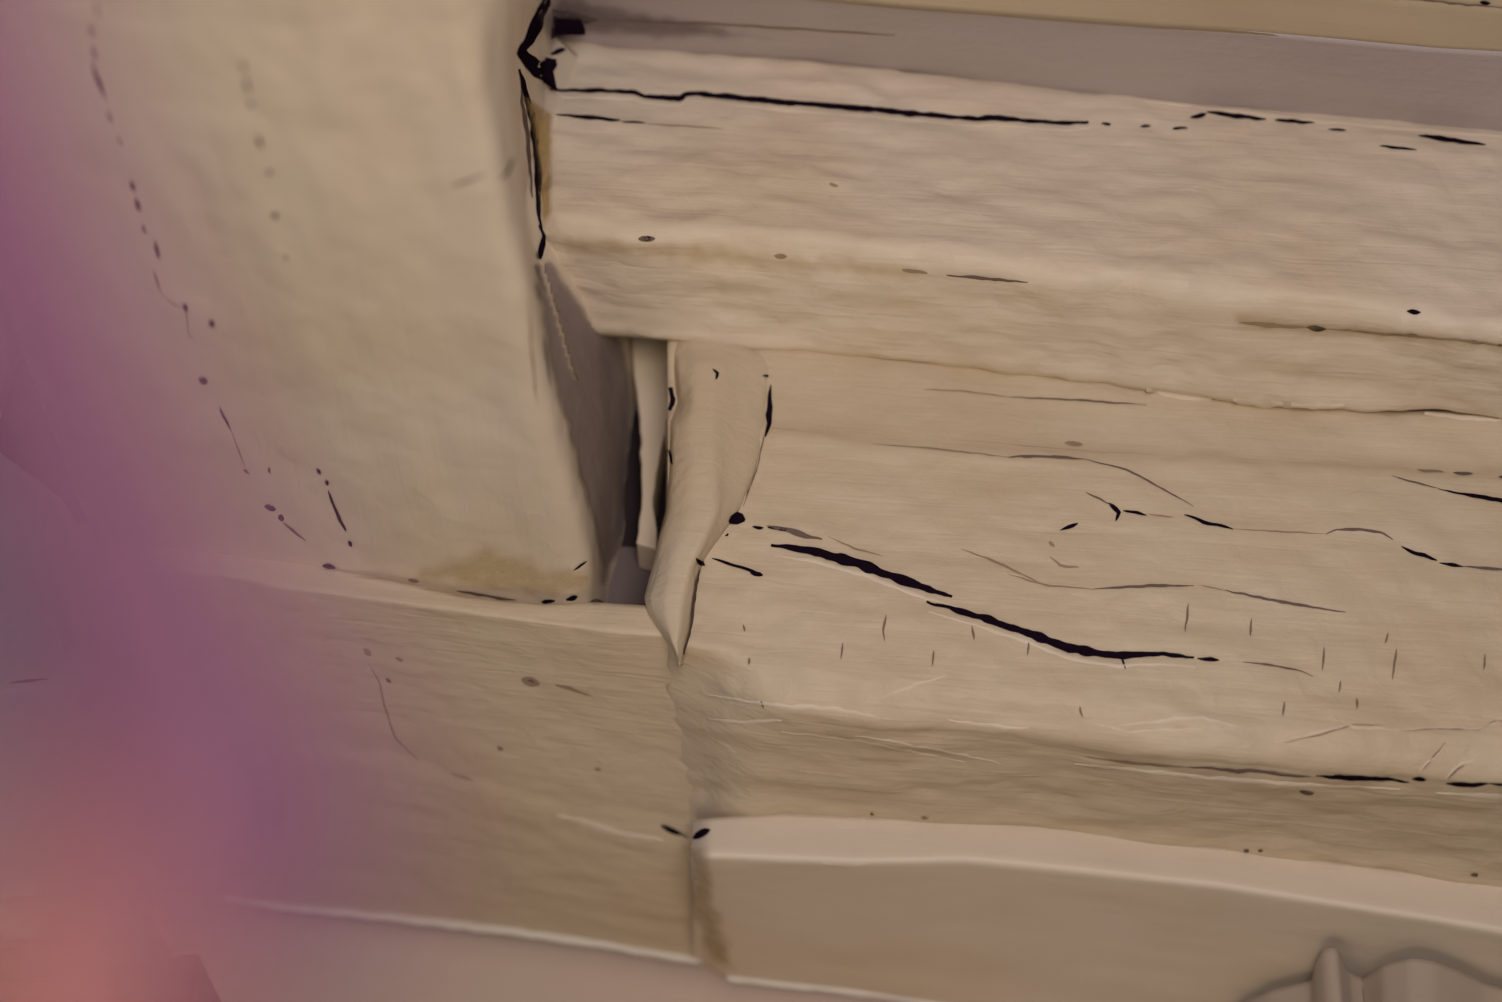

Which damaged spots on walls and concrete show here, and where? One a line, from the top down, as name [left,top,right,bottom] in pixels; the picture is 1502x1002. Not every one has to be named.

crack [131,181,216,340]
crack [450,69,1502,405]
crack [199,377,352,569]
crack [457,561,604,604]
crack [684,375,1345,677]
crack [879,441,1502,570]
crack [1074,720,1502,800]